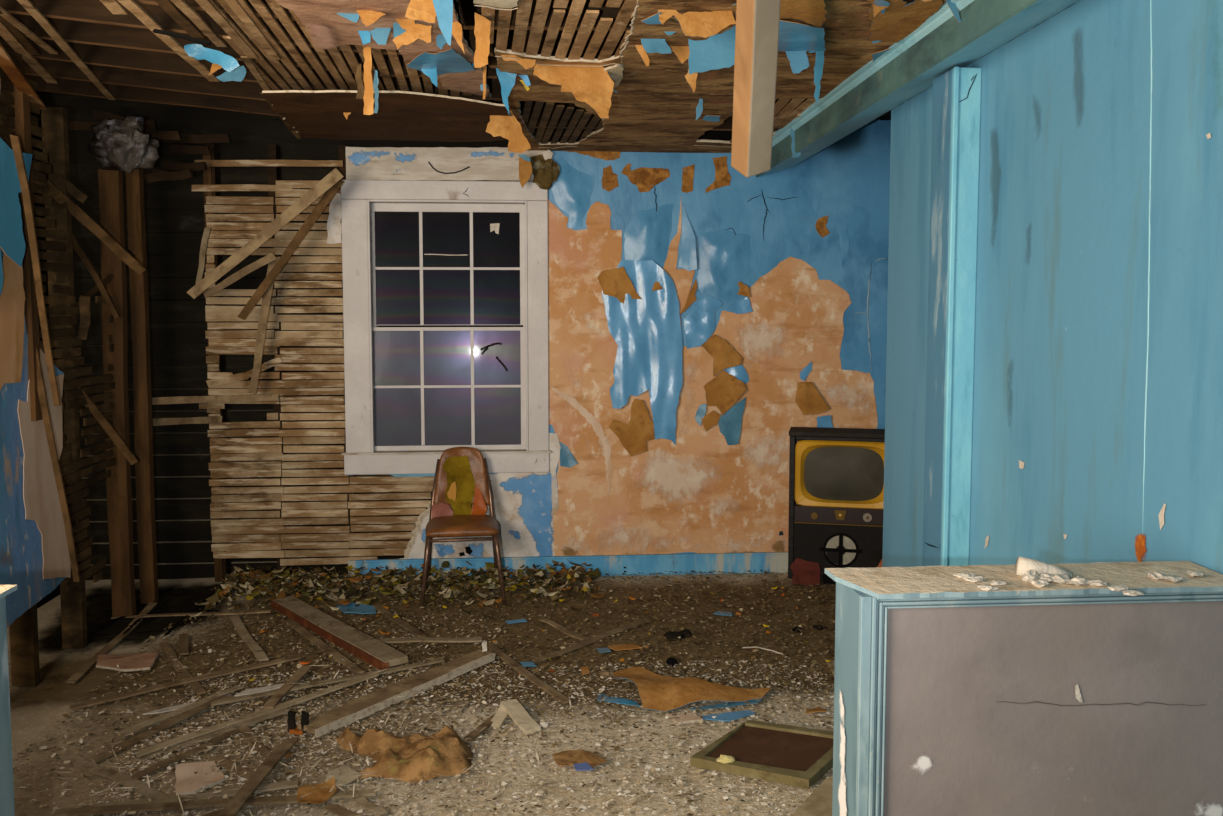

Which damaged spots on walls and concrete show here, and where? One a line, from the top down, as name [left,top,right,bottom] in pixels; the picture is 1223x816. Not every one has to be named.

flaking render [100,0,472,139]
flaking render [473,0,639,88]
crack [724,189,797,240]
flaking render [0,0,116,591]
peeling [152,98,878,566]